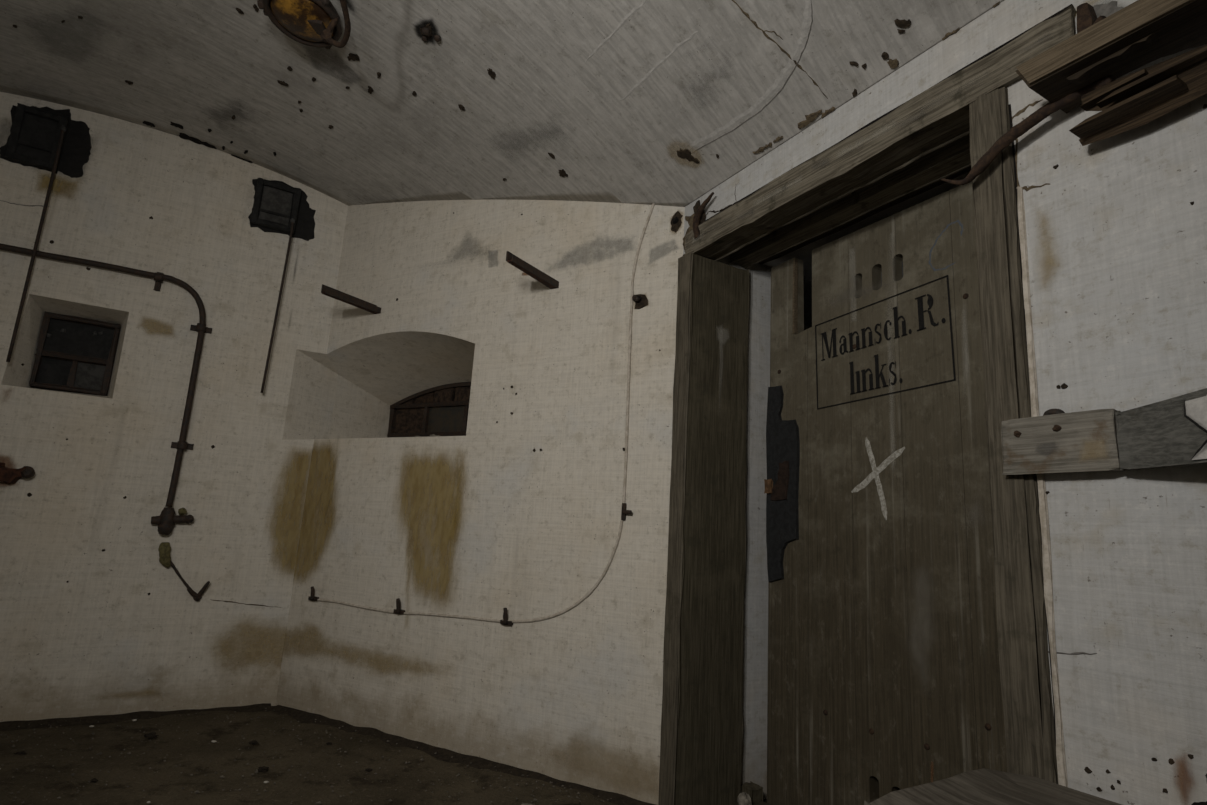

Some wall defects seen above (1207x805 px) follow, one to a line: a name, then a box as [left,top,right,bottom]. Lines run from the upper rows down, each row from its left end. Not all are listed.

crack [732,0,828,99]
damp [274,446,335,578]
damp [401,457,460,599]
rust [1178,760,1191,799]